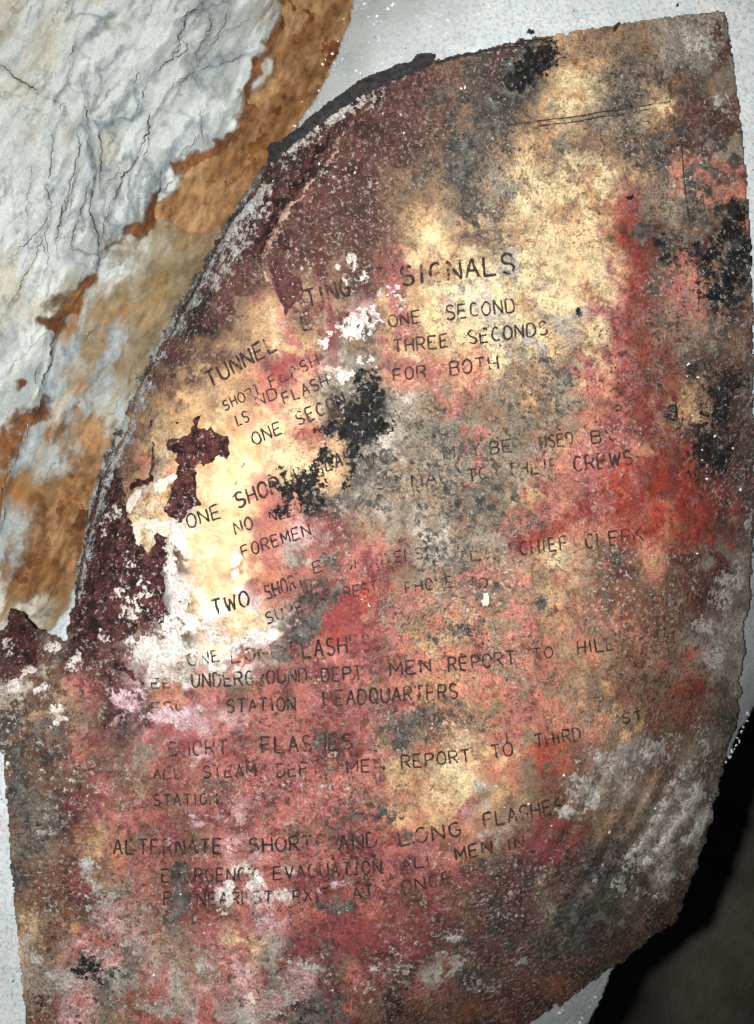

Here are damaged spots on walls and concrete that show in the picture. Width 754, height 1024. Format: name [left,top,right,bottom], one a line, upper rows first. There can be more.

leakage [412,39,565,201]
crack [0,4,249,399]
rust [0,0,353,603]
leakage [630,160,748,310]
leakage [527,345,573,432]
crack [1,434,26,524]
peeling [2,616,38,668]
peeling [69,416,230,686]
leakage [267,368,547,645]
leakage [533,594,558,616]